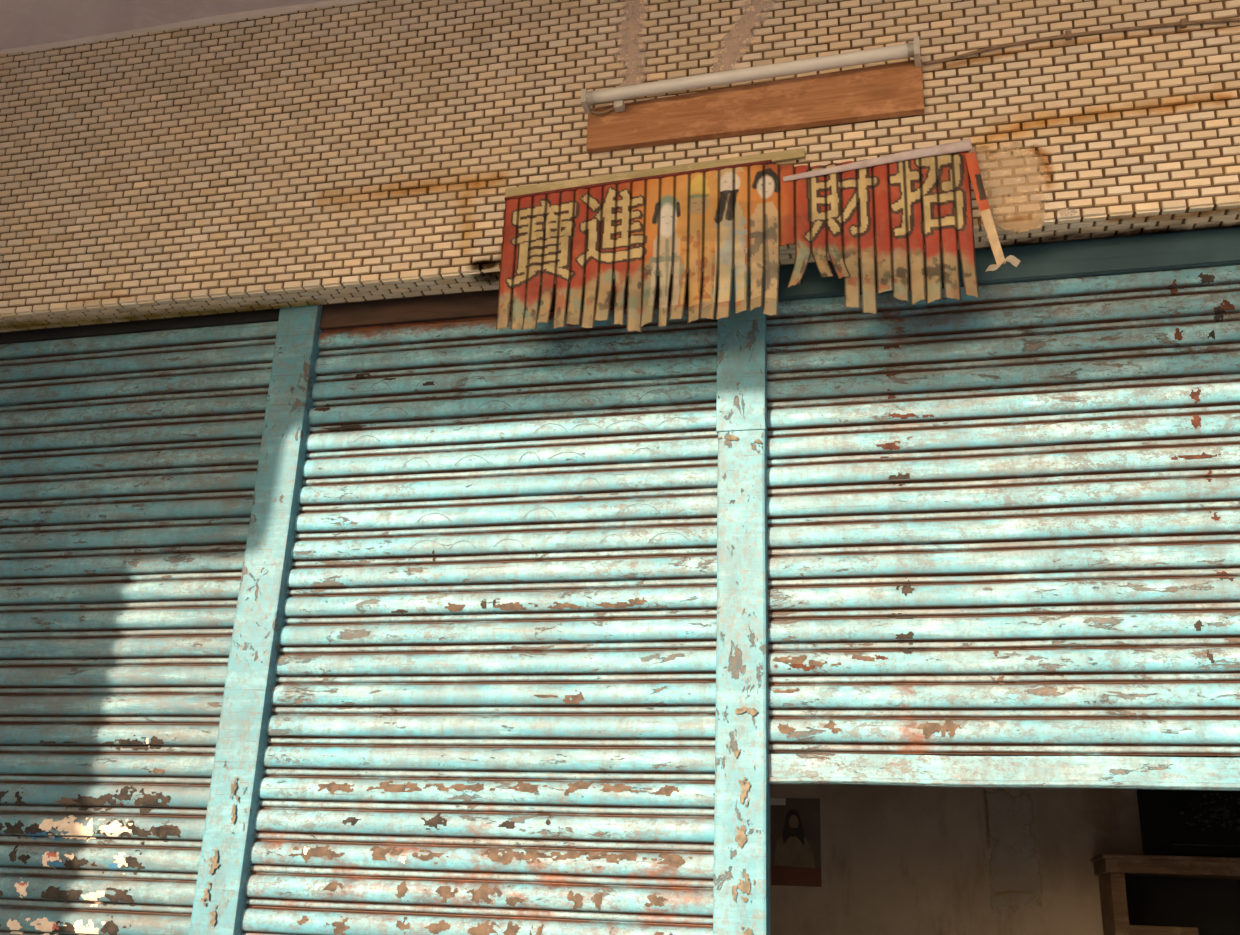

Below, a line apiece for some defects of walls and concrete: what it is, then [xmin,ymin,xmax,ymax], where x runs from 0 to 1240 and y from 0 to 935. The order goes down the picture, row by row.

rust [1198,272,1215,286]
rust [1207,299,1235,340]
rust [886,370,934,424]
rust [1190,388,1201,429]
rust [876,441,911,486]
rust [1171,452,1221,482]
rust [896,577,915,596]
rust [887,613,926,654]
peeling [40,735,164,751]
peeling [0,785,181,935]